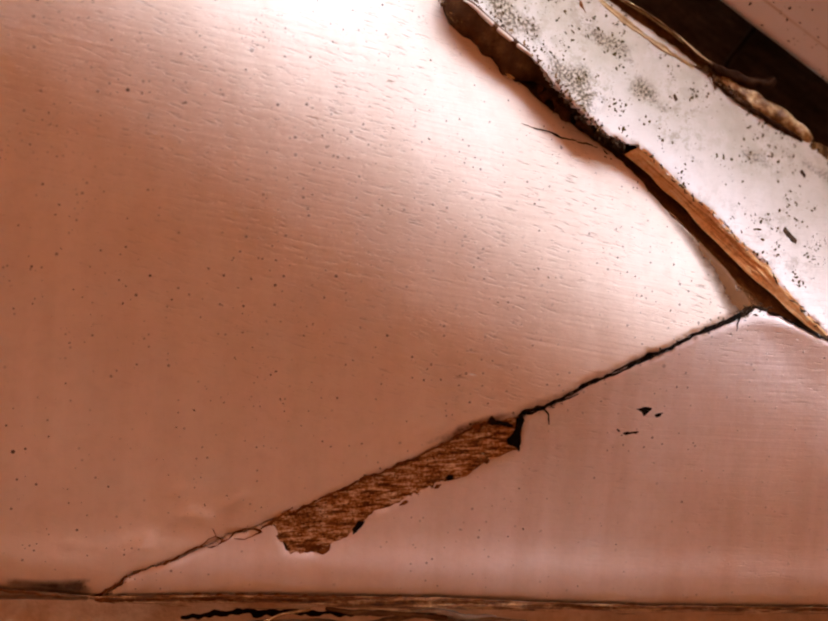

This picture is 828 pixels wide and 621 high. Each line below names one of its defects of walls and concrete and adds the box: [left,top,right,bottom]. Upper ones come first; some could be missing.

peeling [599,0,828,164]
crack [471,0,828,425]
crack [94,507,293,596]
peeling [267,413,525,555]